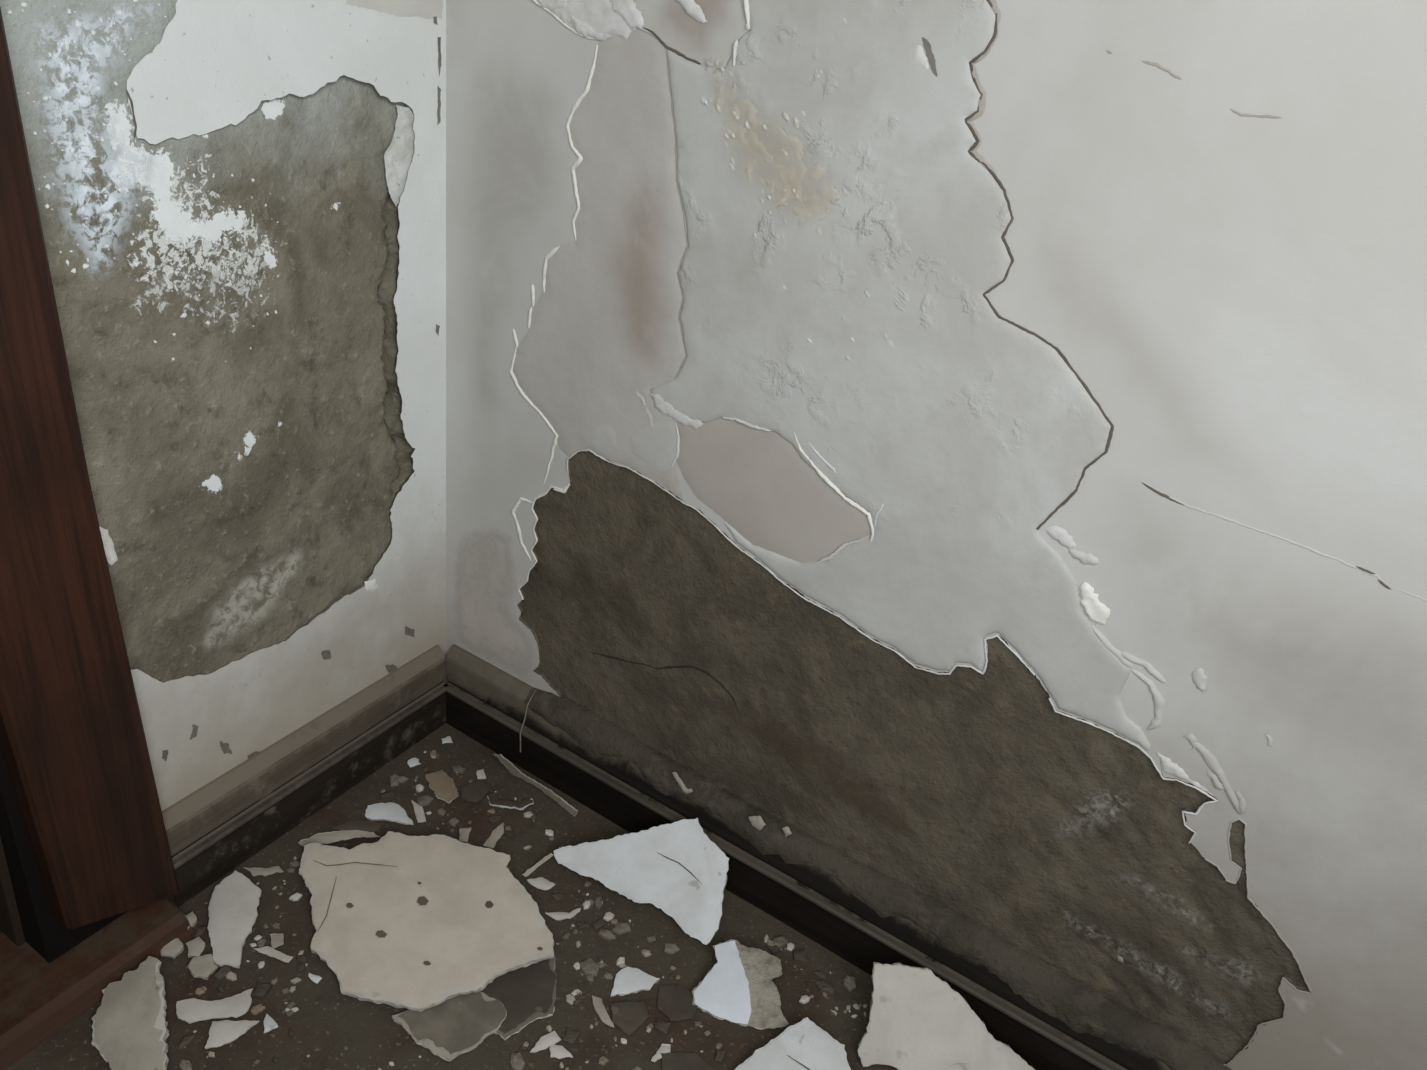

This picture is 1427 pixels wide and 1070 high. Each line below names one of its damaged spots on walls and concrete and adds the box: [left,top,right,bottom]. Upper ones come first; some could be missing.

leakage [38,5,153,264]
peeling [345,0,443,124]
spalling [0,0,415,683]
spalling [513,0,1313,1066]
crack [1140,480,1427,602]